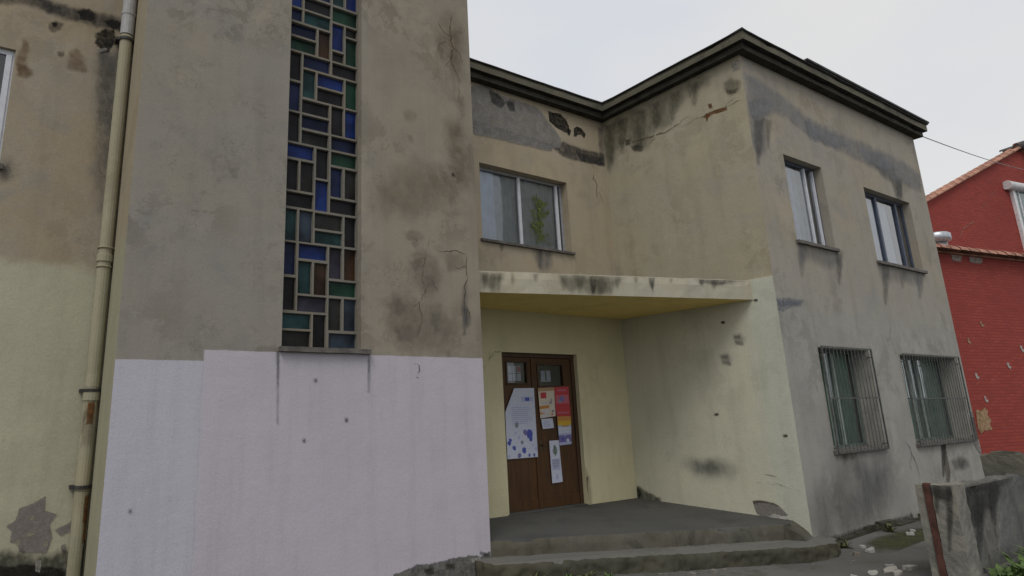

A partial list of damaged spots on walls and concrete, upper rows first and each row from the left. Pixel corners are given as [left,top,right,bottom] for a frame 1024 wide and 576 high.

leakage [32,0,121,30]
peeling [471,85,585,151]
crack [414,243,470,336]
corrosion [86,402,95,424]
peeling [971,397,992,455]
peeling [7,497,71,553]
peeling [753,500,788,520]